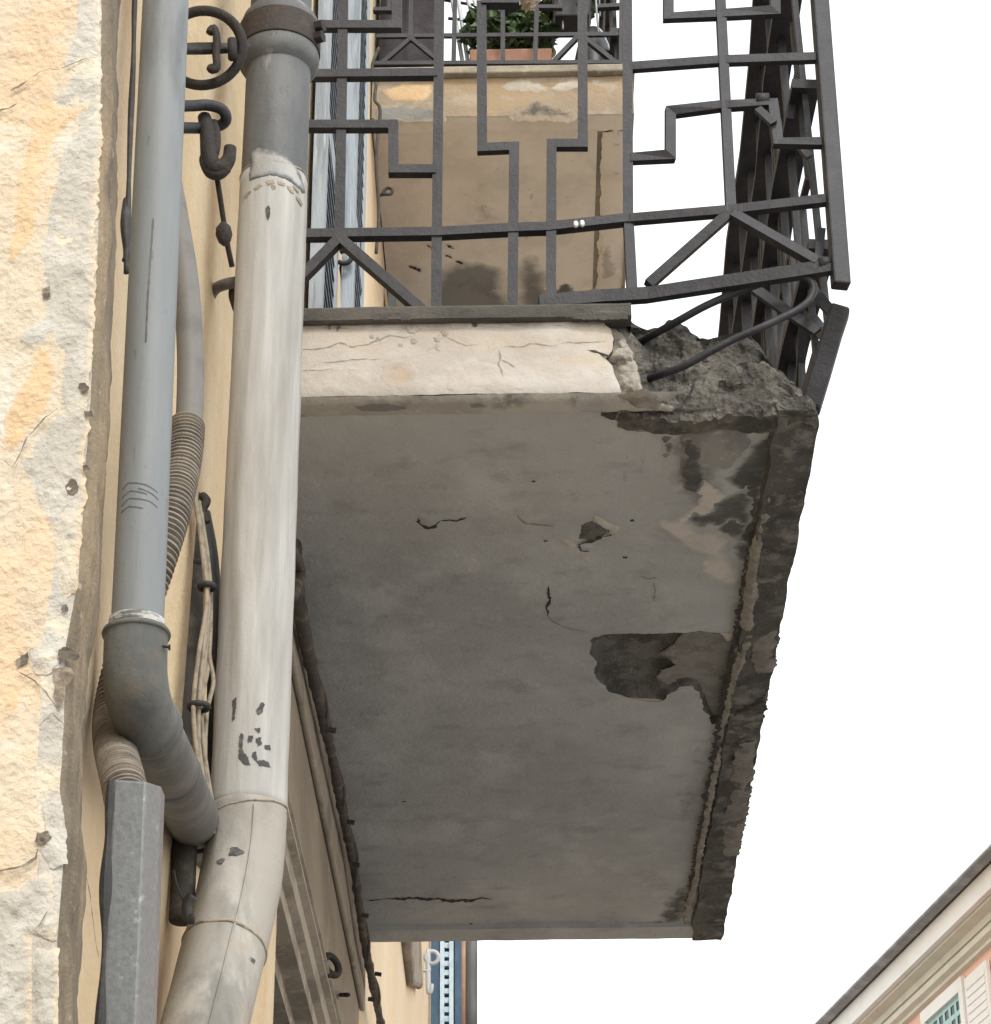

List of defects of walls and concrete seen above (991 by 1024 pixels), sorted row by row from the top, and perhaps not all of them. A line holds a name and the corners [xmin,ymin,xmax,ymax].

damp [429,254,574,306]
crack [302,335,410,371]
crack [497,341,611,375]
crack [395,505,468,529]
peeling [577,515,634,552]
damp [622,432,770,578]
crack [546,587,589,632]
spalling [590,320,815,922]
crack [369,896,488,904]